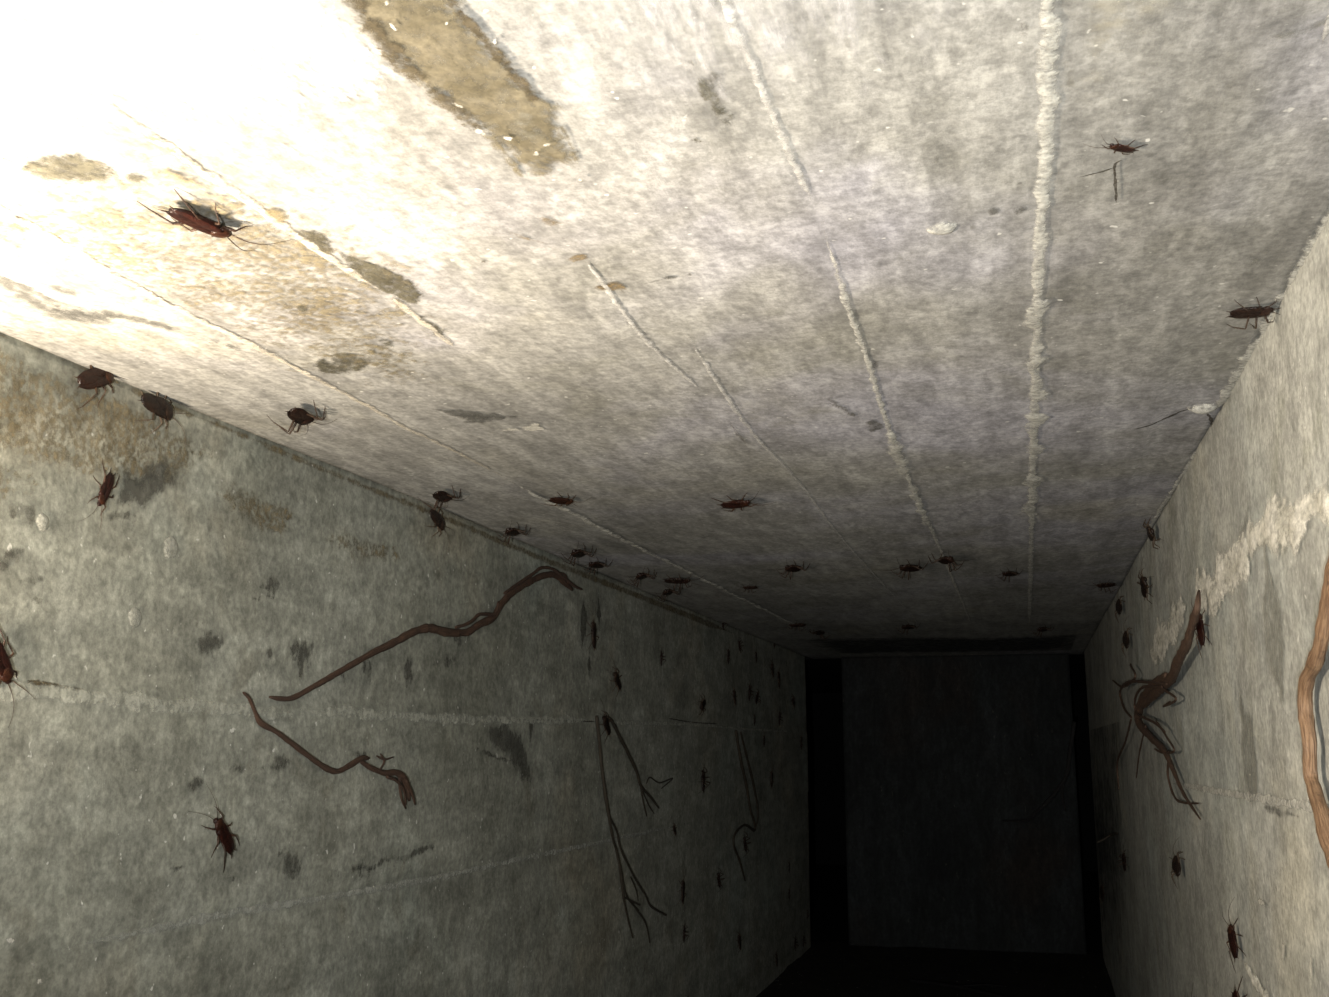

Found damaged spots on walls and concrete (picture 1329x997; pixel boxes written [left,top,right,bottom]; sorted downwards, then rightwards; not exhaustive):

water stain [344,0,578,177]
water stain [0,155,443,378]